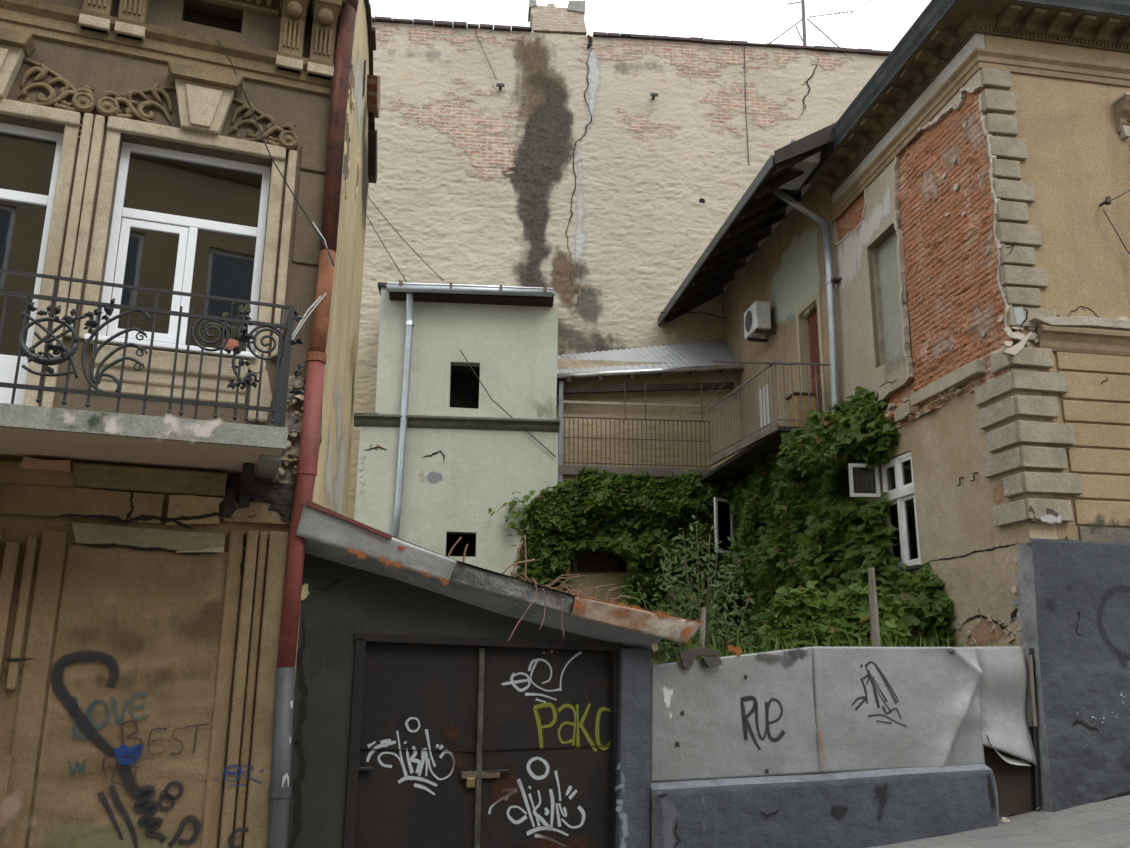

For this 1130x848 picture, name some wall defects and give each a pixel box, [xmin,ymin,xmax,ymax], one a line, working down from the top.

crack [799,60,819,117]
damp [503,37,613,353]
crack [566,34,593,315]
spalling [870,85,1039,428]
crack [48,488,246,576]
corrosion [348,547,406,568]
corrosion [574,594,702,638]
spalling [948,557,1023,645]